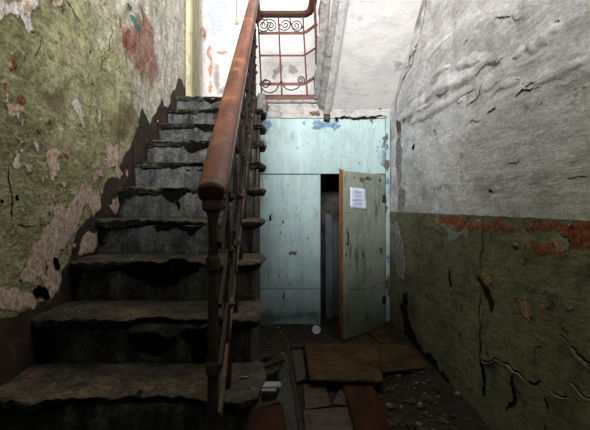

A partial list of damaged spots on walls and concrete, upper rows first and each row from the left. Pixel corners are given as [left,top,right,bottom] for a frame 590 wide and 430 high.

peeling [0,0,40,34]
peeling [119,3,161,94]
crack [467,58,502,107]
crack [515,79,541,97]
peeling [310,110,341,131]
peeling [0,142,128,314]
peeling [433,215,590,260]
flaking render [122,258,201,288]
crack [477,293,590,411]